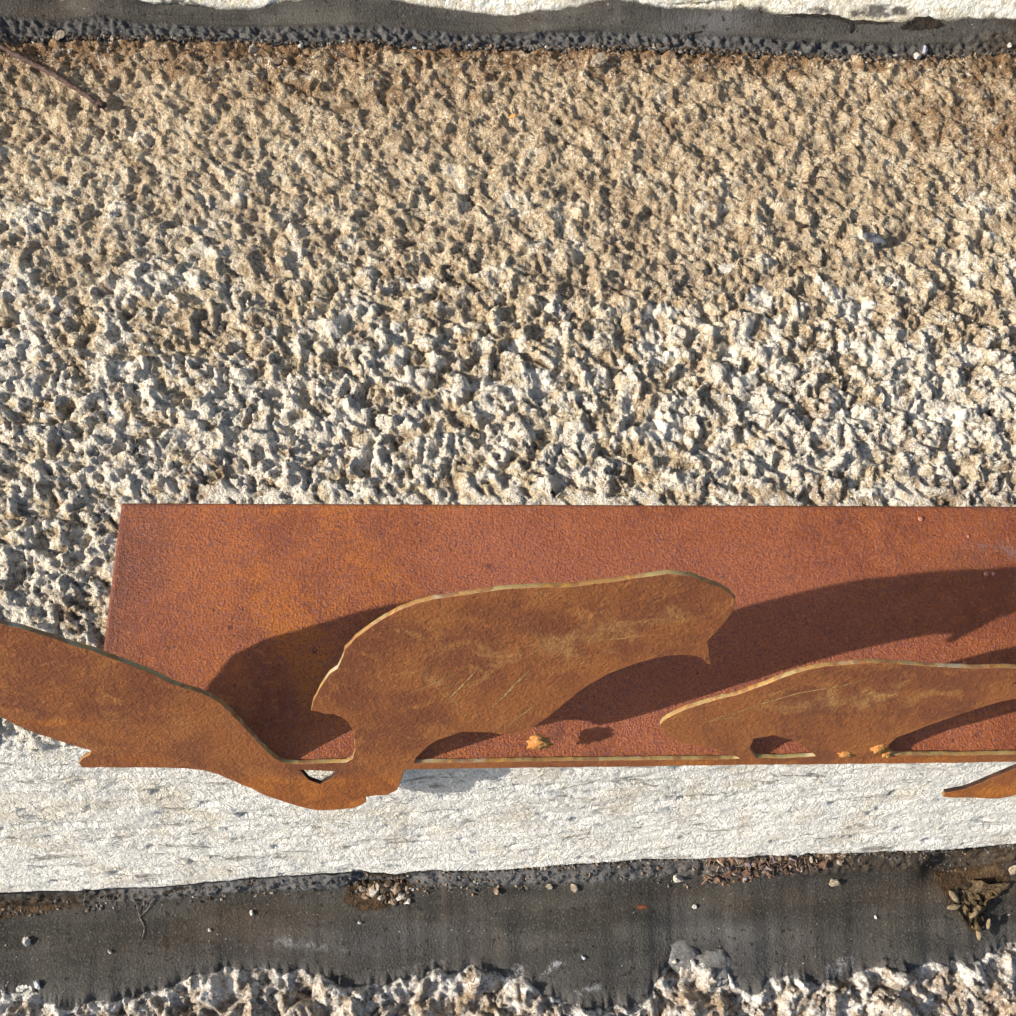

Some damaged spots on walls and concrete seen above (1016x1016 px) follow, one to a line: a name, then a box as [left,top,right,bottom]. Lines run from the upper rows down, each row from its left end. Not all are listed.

crack [775,13,894,33]